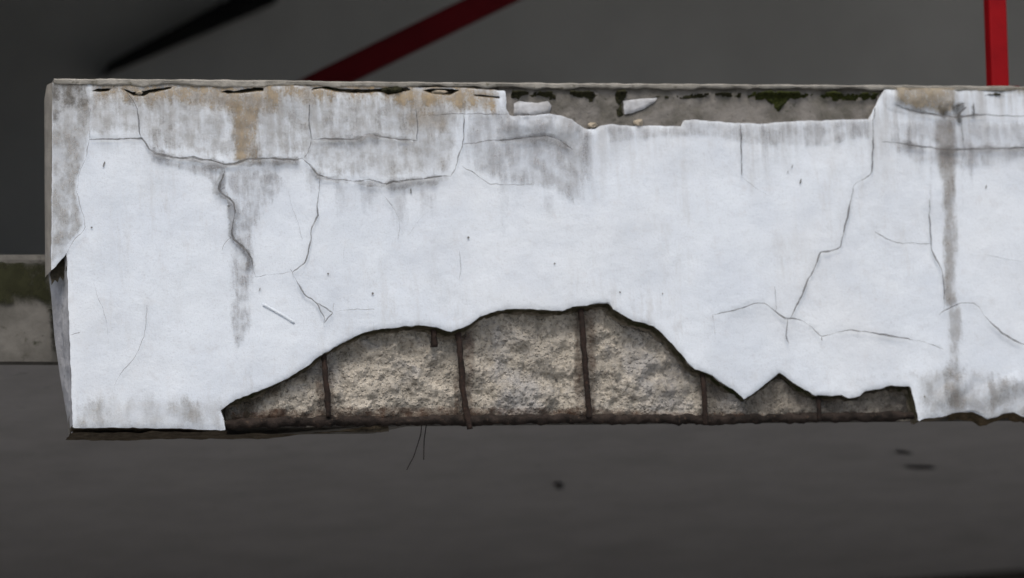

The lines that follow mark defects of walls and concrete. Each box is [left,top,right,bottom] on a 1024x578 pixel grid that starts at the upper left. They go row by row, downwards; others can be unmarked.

leakage [101,85,503,160]
peeling [473,87,882,129]
crack [68,91,572,323]
crack [712,103,1024,349]
leakage [896,88,955,304]
spalling [50,253,67,285]
spalling [224,302,925,430]
corrosion [232,408,313,419]
corrosion [340,406,642,417]